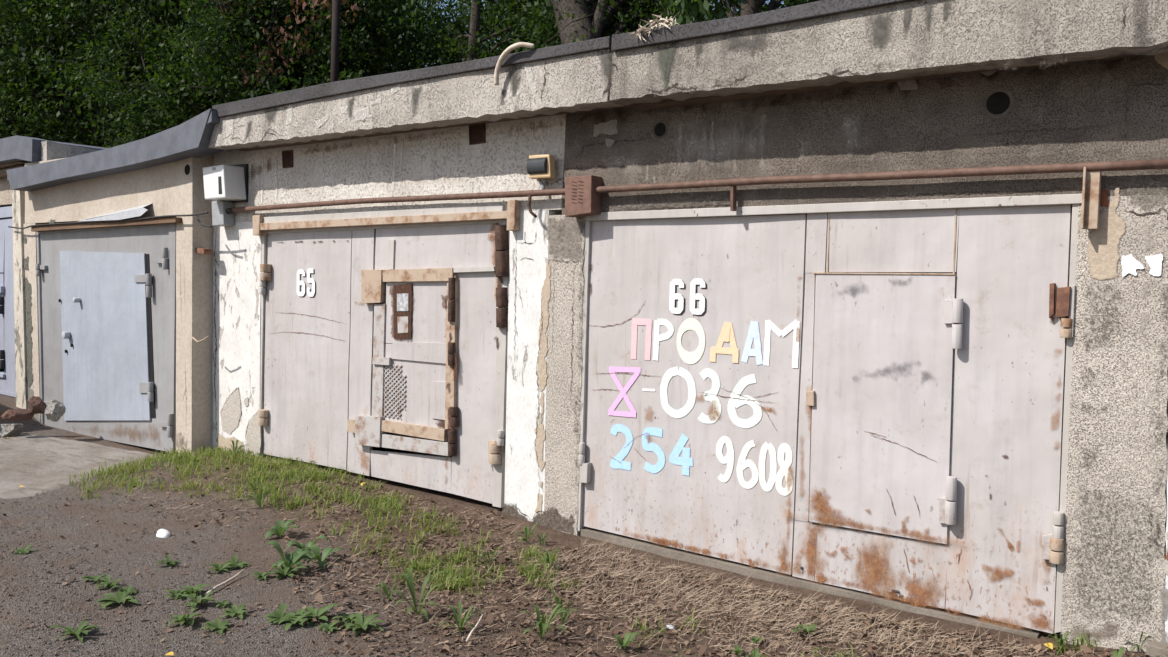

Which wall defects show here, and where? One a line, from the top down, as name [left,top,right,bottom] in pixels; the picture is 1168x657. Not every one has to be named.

leakage [925,1,949,26]
leakage [873,14,889,47]
spalling [1100,177,1167,210]
peeling [217,387,261,454]
rust [779,451,959,615]
peeling [1160,531,1168,644]
rust [982,598,1052,630]